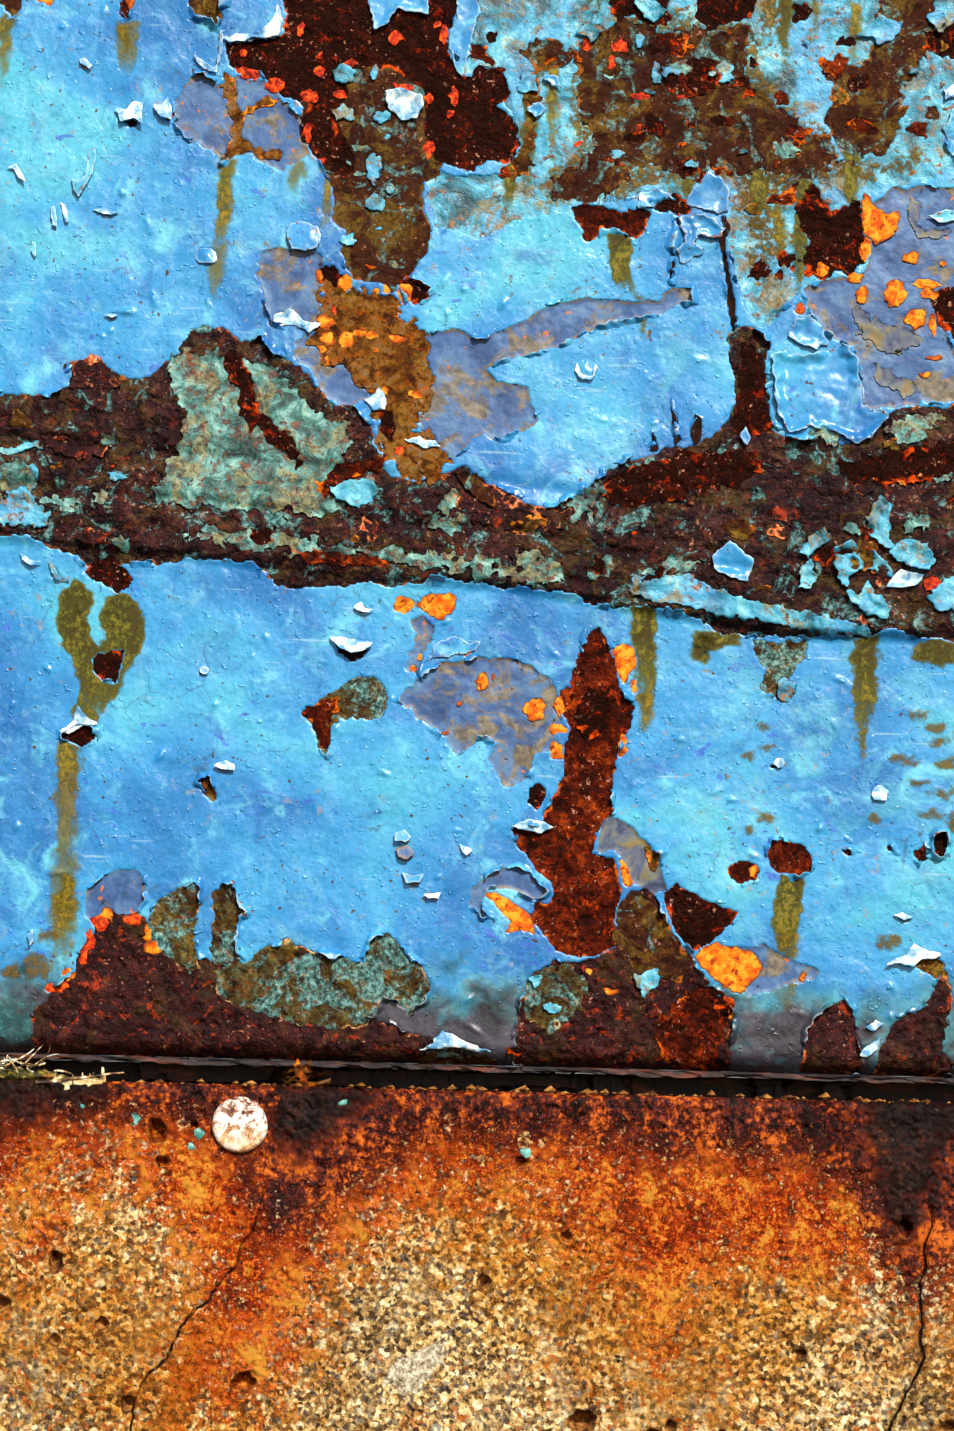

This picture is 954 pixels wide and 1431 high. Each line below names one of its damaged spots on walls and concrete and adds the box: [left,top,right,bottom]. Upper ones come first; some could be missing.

peeling [115,69,309,171]
peeling [420,0,954,460]
peeling [256,244,371,406]
corrosion [0,0,954,1077]
peeling [330,636,373,661]
peeling [393,592,563,788]
peeling [85,869,151,919]
peeling [395,830,441,901]
peeling [469,862,552,923]
peeling [887,943,943,967]
crack [130,1189,264,1431]
crack [889,1188,933,1431]